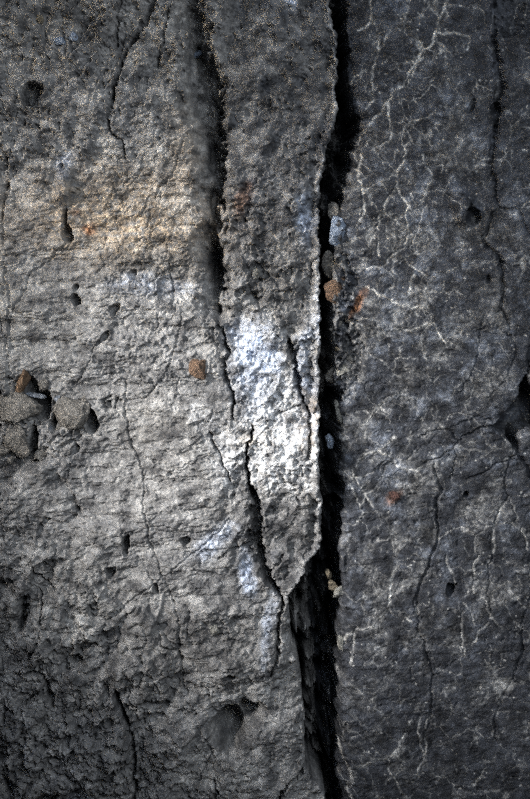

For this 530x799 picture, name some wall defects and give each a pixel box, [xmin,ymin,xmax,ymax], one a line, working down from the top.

crack [70,239,307,799]
crack [331,0,530,799]